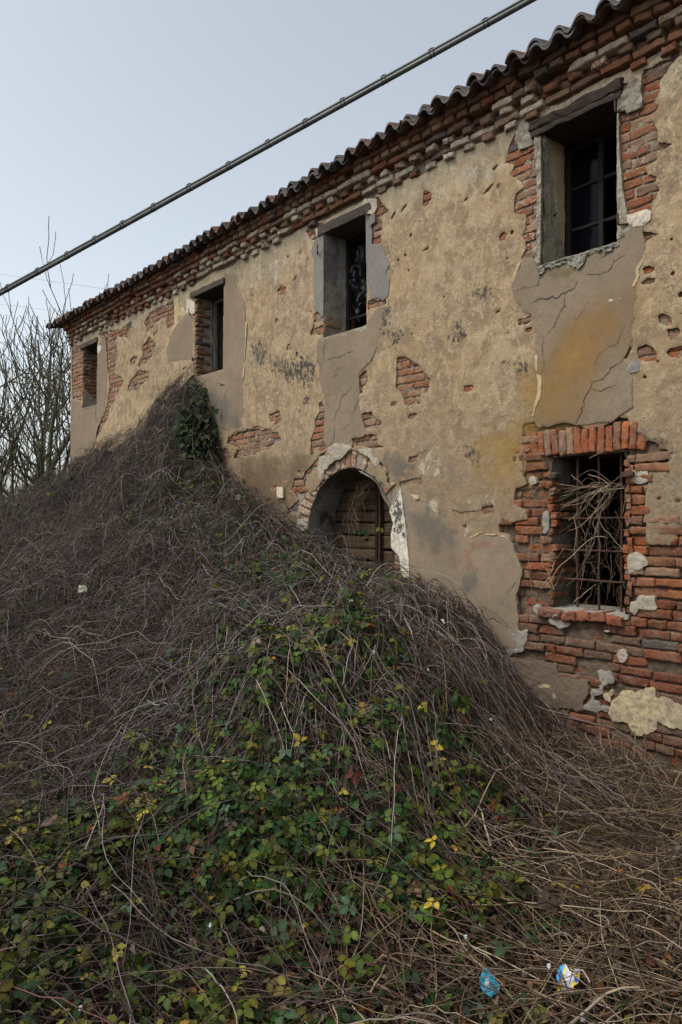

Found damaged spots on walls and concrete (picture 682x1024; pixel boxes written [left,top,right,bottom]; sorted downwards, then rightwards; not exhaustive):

flaking render [620,50,682,214]
flaking render [494,135,544,282]
flaking render [72,345,87,401]
flaking render [98,296,196,435]
flaking render [220,411,282,468]
leakage [251,340,315,412]
flaking render [272,402,422,520]
flaking render [391,357,430,419]
crack [488,247,624,367]
crack [576,325,625,422]
flaking render [626,314,682,363]
flaking render [463,355,682,785]